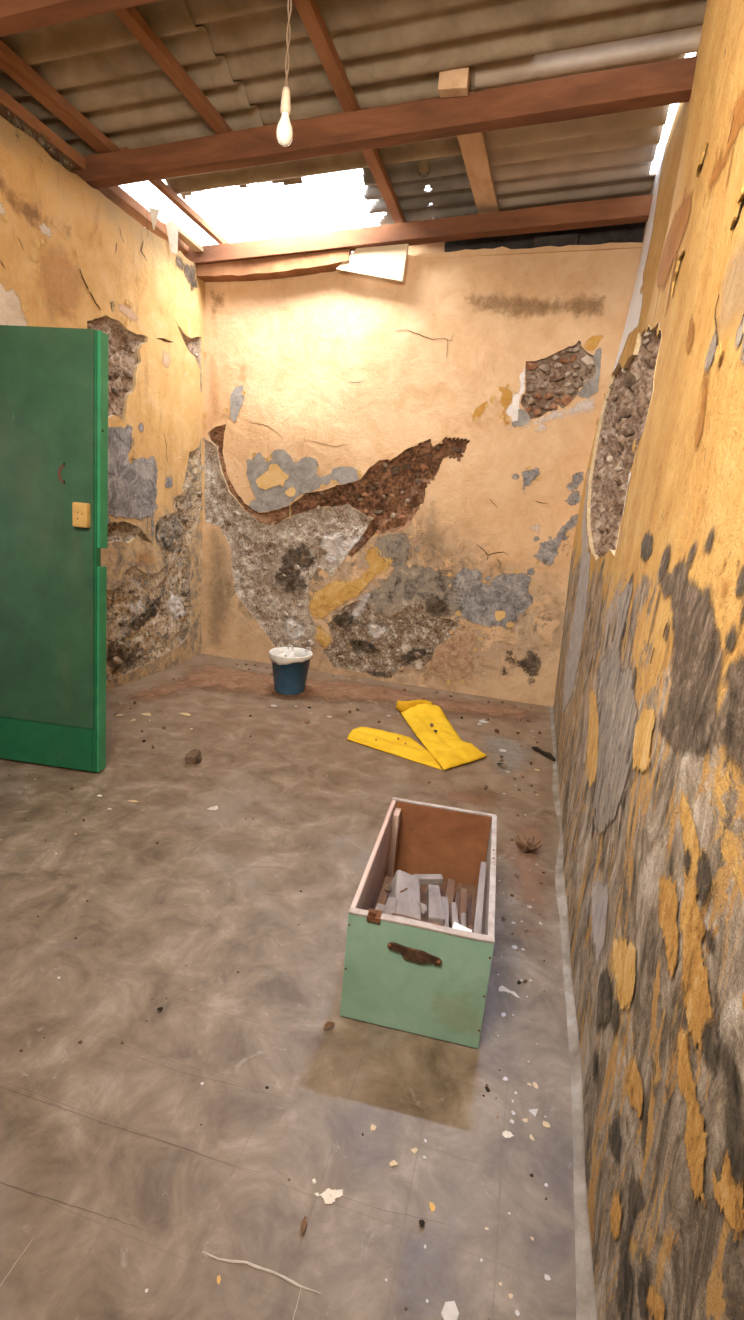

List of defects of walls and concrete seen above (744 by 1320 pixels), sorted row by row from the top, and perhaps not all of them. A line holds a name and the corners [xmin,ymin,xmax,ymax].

peeling [0,283,34,326]
flaking render [704,317,744,372]
flaking render [87,298,662,685]